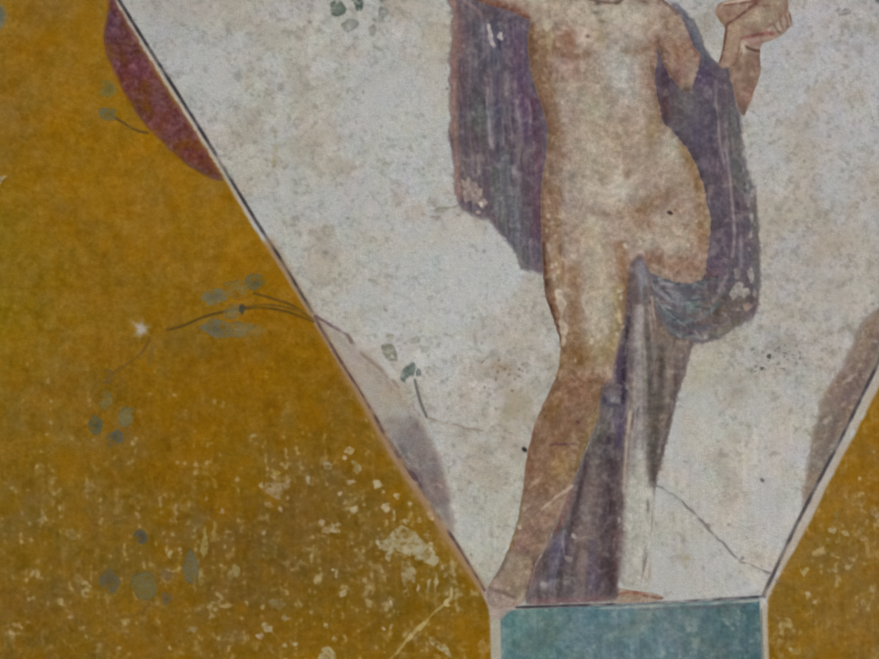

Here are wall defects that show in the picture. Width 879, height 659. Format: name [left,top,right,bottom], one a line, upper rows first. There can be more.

peeling [258,461,292,514]
peeling [322,445,363,497]
peeling [192,507,225,595]
peeling [317,517,342,539]
peeling [371,479,449,598]
crack [650,482,784,585]
peeling [799,509,870,578]
peeling [254,597,304,641]
peeling [303,622,363,659]
peeling [427,624,453,659]
peeling [778,617,802,656]